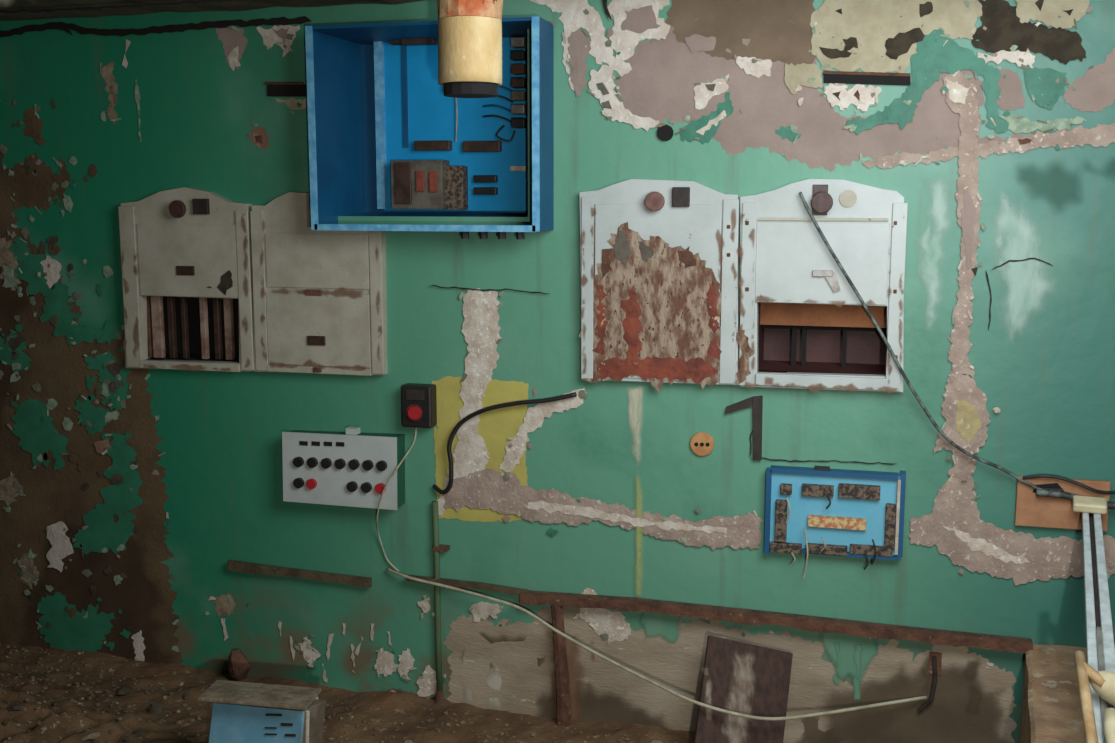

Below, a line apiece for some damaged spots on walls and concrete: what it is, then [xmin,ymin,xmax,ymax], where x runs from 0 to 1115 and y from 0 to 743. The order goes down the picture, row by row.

peeling [100,39,131,125]
peeling [0,99,183,664]
spalling [432,288,763,550]
peeling [530,0,1115,586]
crack [986,258,1053,330]
spalling [278,588,1017,743]